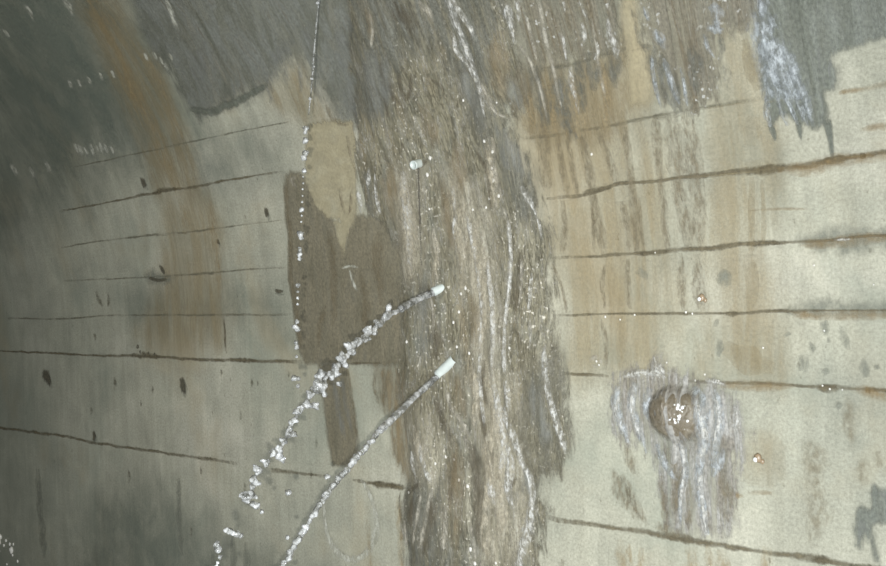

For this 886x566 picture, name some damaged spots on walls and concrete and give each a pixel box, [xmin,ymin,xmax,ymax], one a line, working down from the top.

leakage [503,0,625,130]
leakage [641,0,886,156]
leakage [284,173,410,480]
leakage [854,485,886,559]